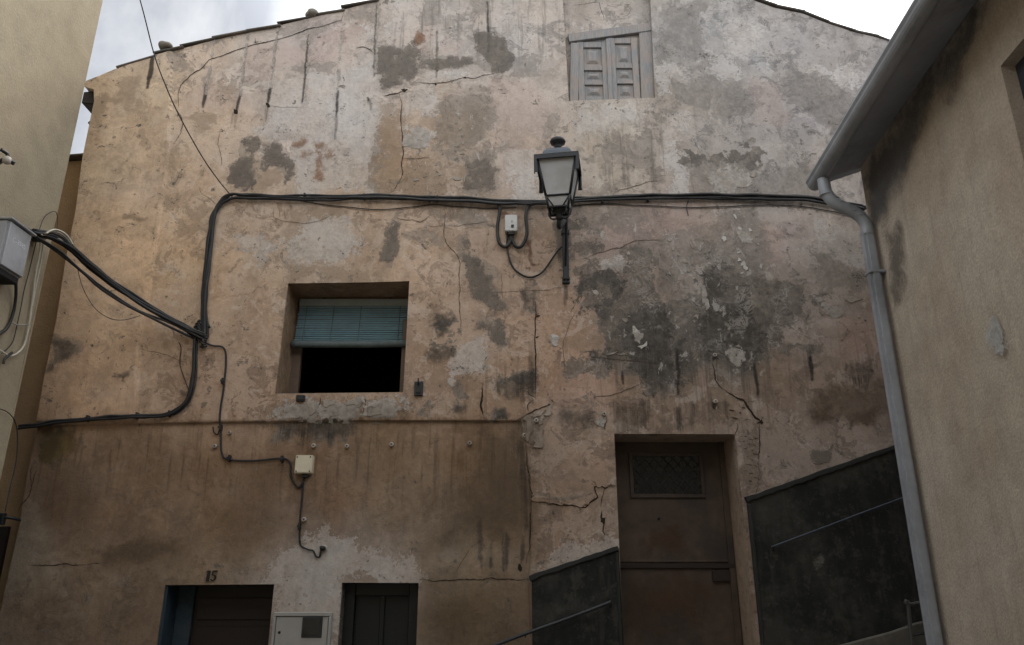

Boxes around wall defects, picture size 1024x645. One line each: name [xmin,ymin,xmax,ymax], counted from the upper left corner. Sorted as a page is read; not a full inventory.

crack [174,13,344,143]
crack [385,72,496,192]
crack [398,204,482,335]
peeling [619,316,647,349]
peeling [693,285,722,323]
peeling [725,326,746,367]
peeling [721,214,762,274]
spalling [267,394,413,424]
crack [713,366,763,492]
crack [419,453,610,582]